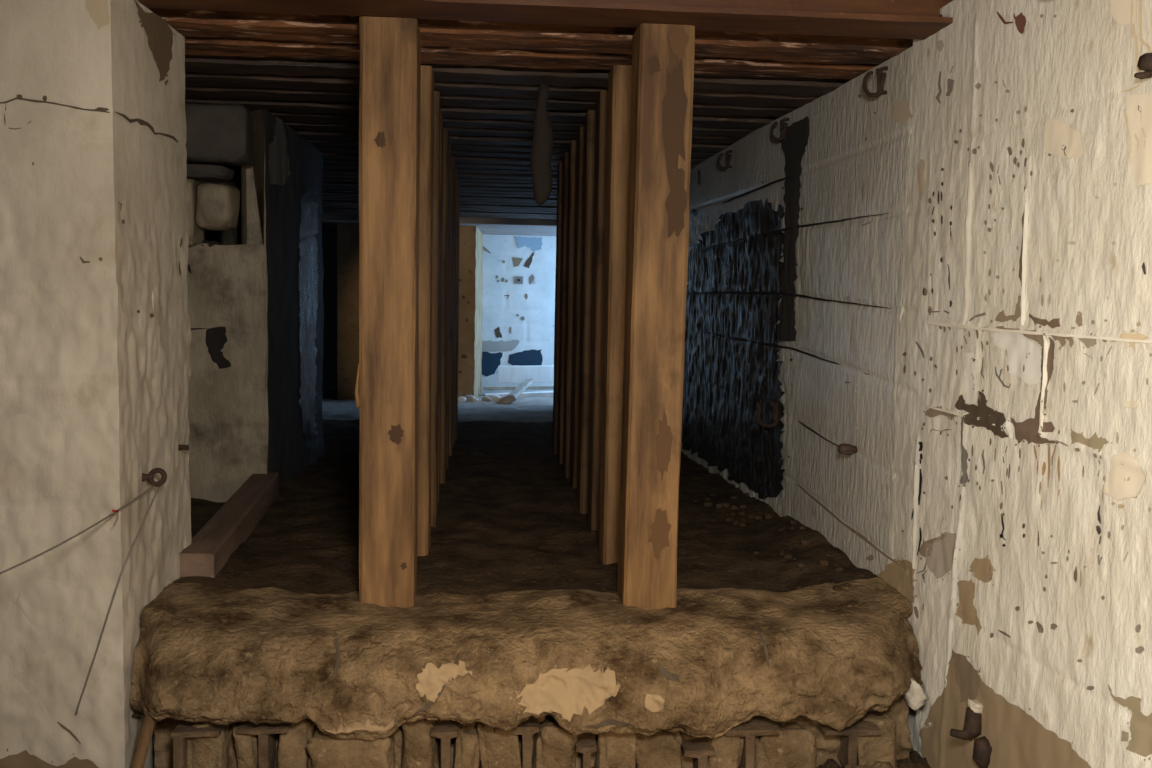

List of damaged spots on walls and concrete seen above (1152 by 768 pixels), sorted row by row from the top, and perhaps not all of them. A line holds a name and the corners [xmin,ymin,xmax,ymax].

spalling [135,0,175,85]
crack [0,94,178,142]
spalling [205,326,231,369]
peeling [922,269,1137,516]
spalling [1108,685,1152,761]